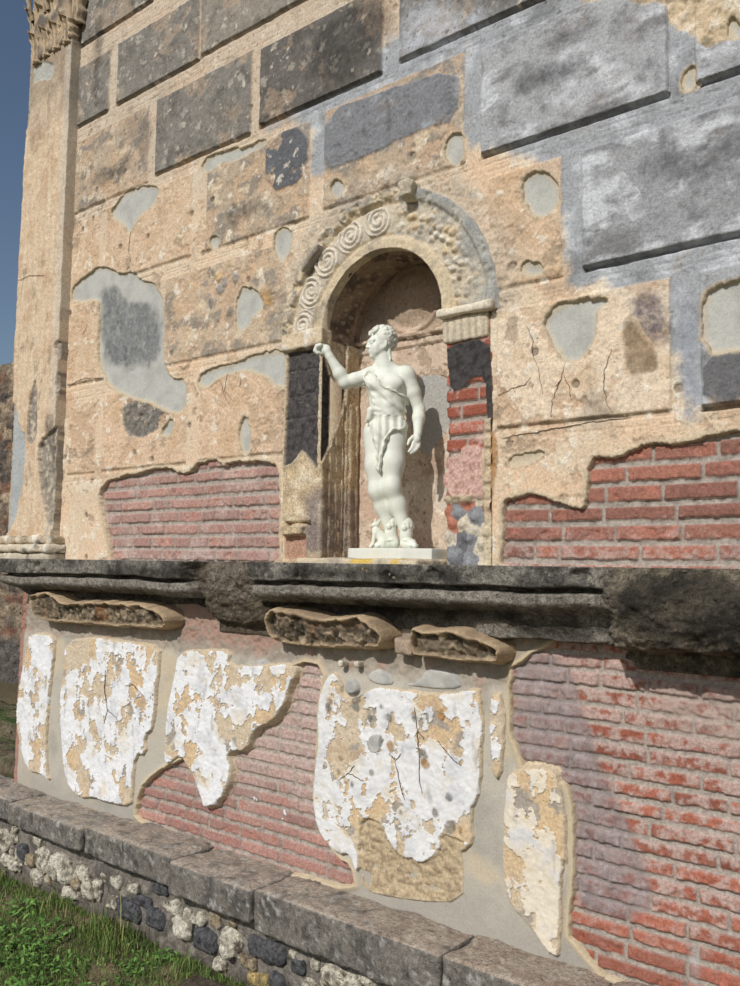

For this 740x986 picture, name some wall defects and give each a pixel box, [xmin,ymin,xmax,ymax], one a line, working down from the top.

crack [500,327,626,438]
flaking render [103,460,281,562]
flaking render [503,432,740,569]
flaking render [16,632,740,986]